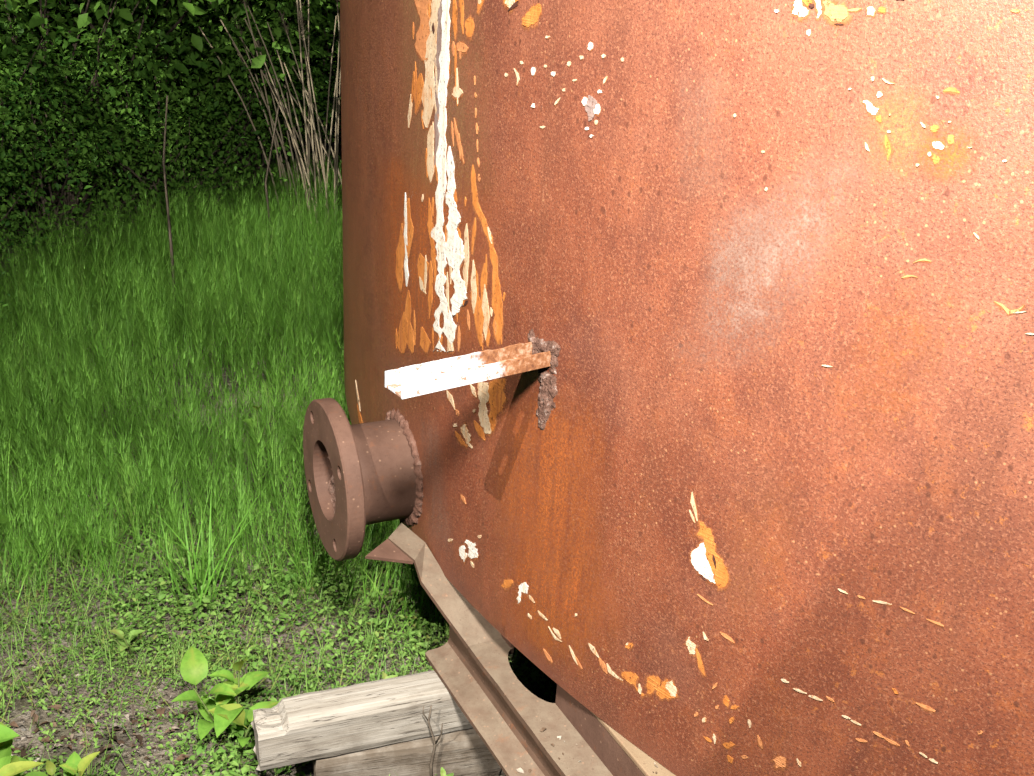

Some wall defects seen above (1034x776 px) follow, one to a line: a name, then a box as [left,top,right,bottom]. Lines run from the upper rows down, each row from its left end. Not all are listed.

rust [502,0,542,30]
peeling [504,61,556,86]
peeling [581,76,608,138]
rust [388,0,506,354]
peeling [404,0,491,355]
rust [355,380,363,424]
peeling [446,377,507,449]
rust [501,403,597,669]
peeling [689,492,731,591]
peeling [516,582,578,665]
rust [622,671,677,699]
rust [856,731,910,746]